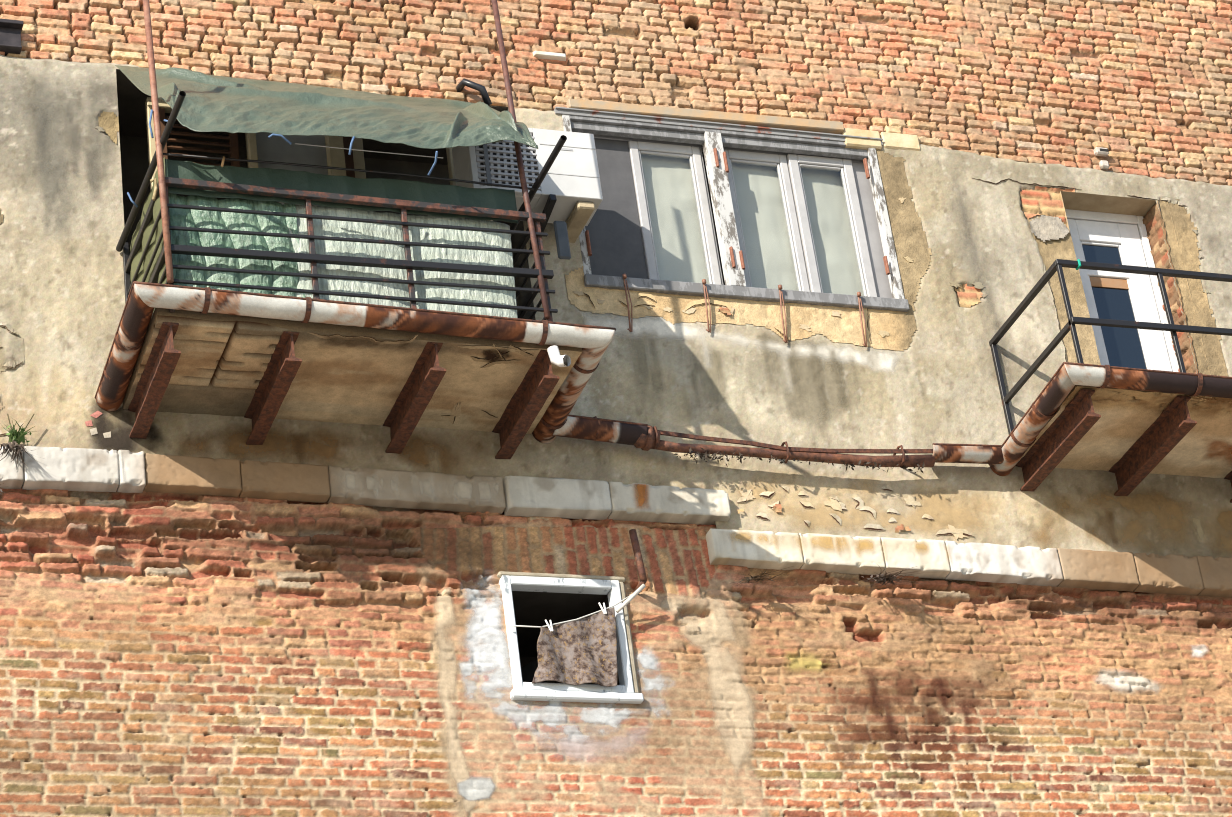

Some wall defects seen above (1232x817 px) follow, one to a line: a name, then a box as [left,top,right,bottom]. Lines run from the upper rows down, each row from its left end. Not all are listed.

flaking render [565,149,932,351]
spalling [950,282,987,308]
spalling [1020,186,1101,365]
flaking render [737,484,981,540]
damp [469,603,508,689]